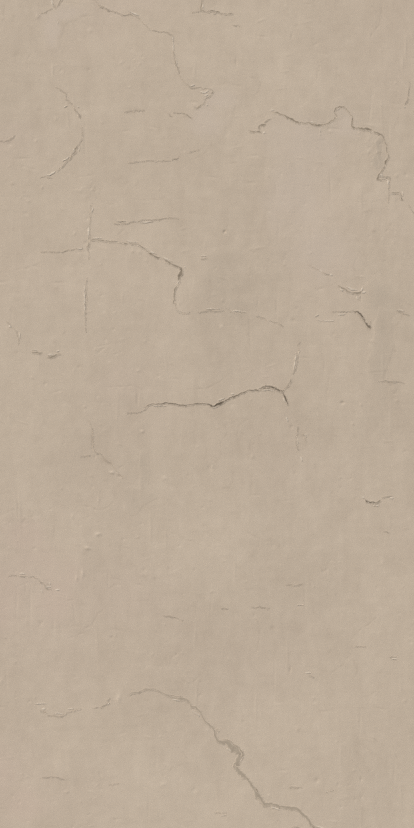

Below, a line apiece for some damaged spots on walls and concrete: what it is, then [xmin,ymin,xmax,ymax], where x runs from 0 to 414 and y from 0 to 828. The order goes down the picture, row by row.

crack [249,105,414,214]
crack [40,205,283,333]
crack [307,264,371,329]
crack [127,341,307,461]
crack [35,688,323,828]